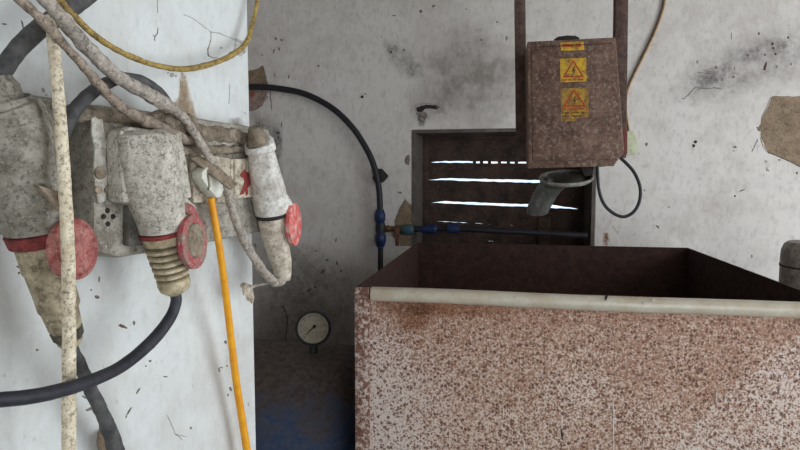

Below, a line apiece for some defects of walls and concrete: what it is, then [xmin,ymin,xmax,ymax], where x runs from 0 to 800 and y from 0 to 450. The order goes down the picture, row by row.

crack [184,14,236,58]
spalling [248,54,275,111]
spalling [757,96,800,174]
spalling [393,191,412,246]